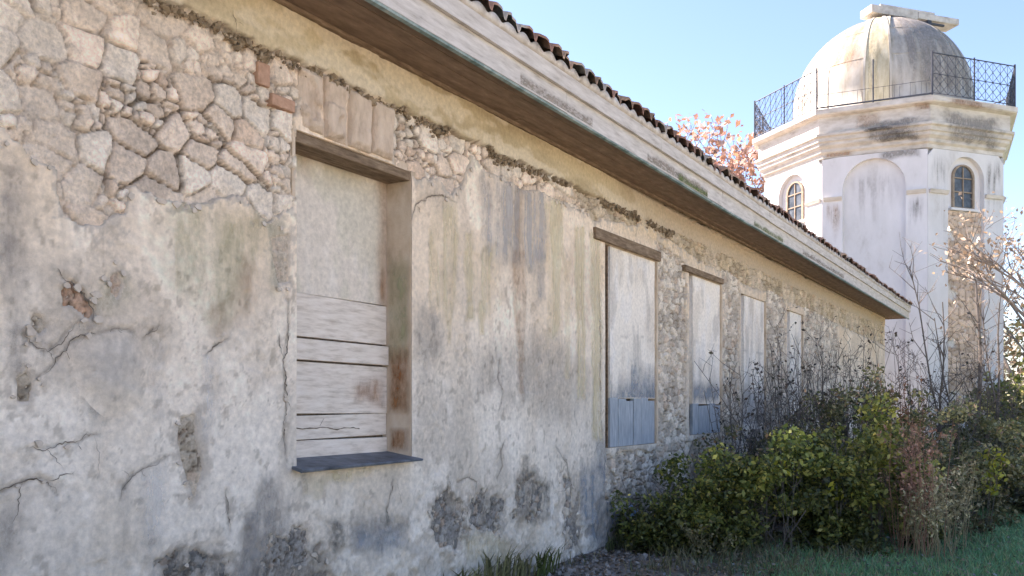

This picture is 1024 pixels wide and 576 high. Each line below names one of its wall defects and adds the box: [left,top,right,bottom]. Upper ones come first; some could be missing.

flaking render [0,0,302,292]
leakage [862,118,917,158]
leakage [947,114,995,148]
crack [24,270,159,376]
flaking render [61,261,127,324]
leakage [503,186,562,335]
flaking render [393,108,884,515]
flaking render [10,364,46,402]
crack [278,306,360,445]
crack [3,434,100,523]
flaking render [175,415,202,500]
flaking render [427,472,543,556]